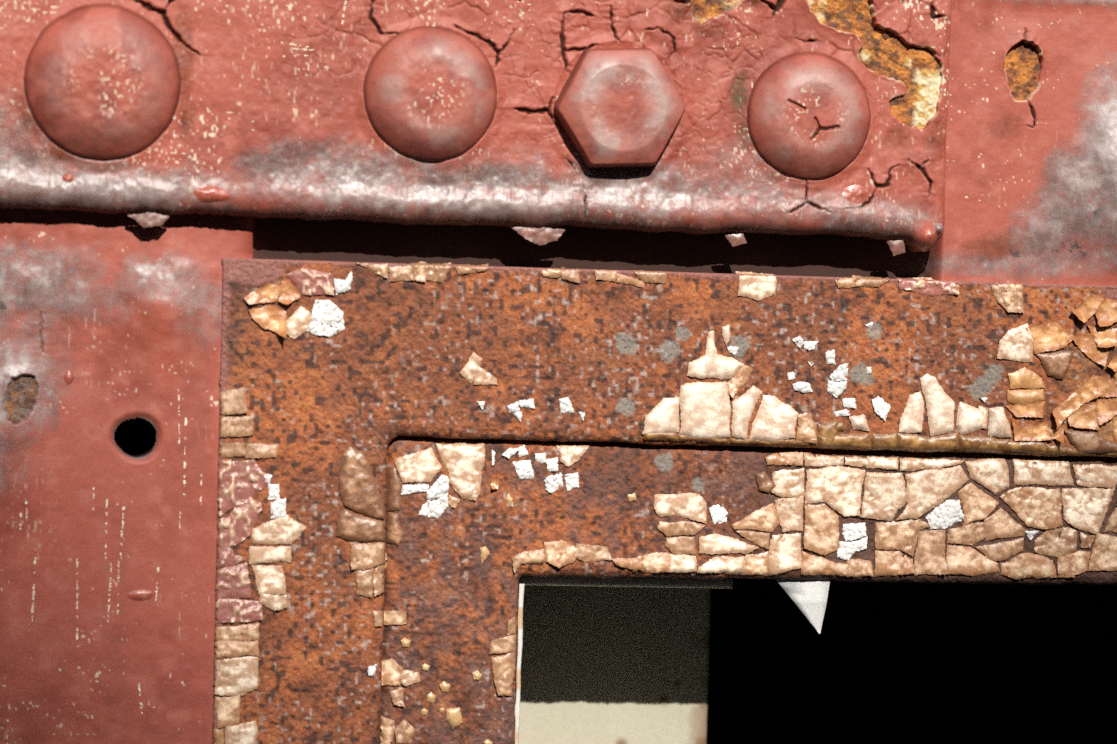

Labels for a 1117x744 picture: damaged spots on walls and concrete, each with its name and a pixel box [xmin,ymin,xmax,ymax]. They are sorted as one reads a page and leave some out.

crack [135,0,181,42]
crack [456,27,508,65]
crack [560,11,617,69]
crack [517,101,552,119]
crack [789,186,821,213]
crack [861,162,932,207]
peeling [244,261,489,339]
peeling [735,271,777,301]
peeling [512,283,1117,580]
peeling [213,387,307,744]
peeling [336,442,590,647]
peeling [368,658,430,744]